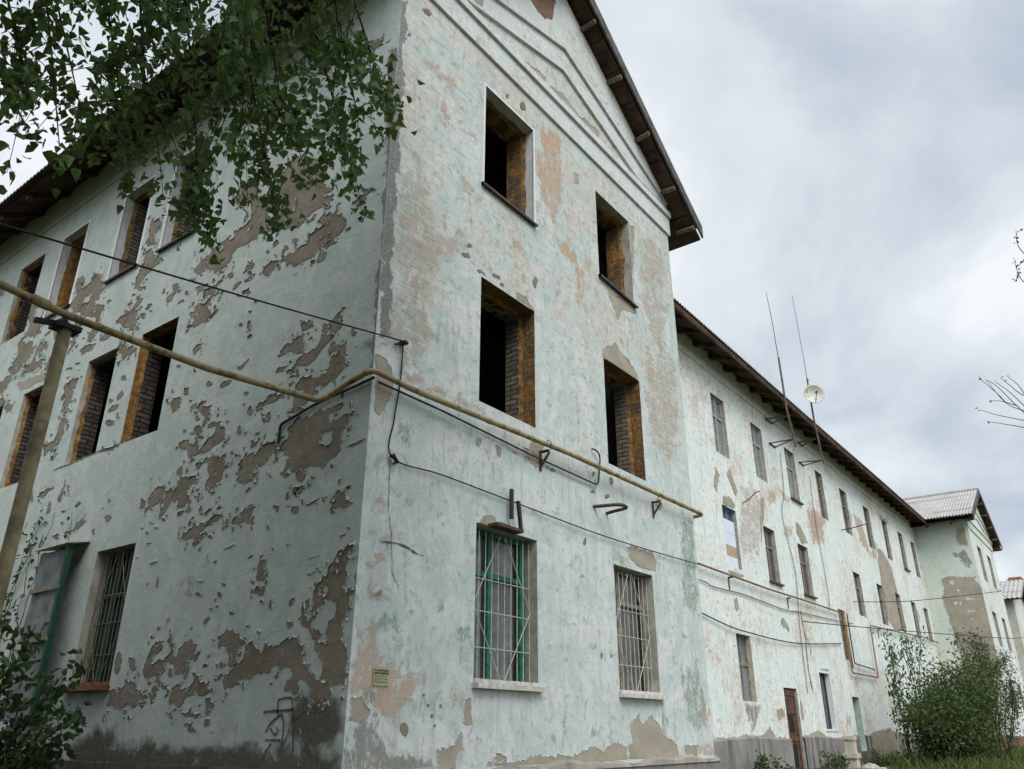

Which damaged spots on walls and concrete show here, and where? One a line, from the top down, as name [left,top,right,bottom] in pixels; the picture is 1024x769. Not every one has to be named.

peeling [162,0,472,414]
peeling [40,207,170,460]
peeling [139,306,358,564]
leakage [70,688,432,769]
peeling [102,526,442,736]
flaking render [487,708,786,767]
flaking render [939,574,1000,679]